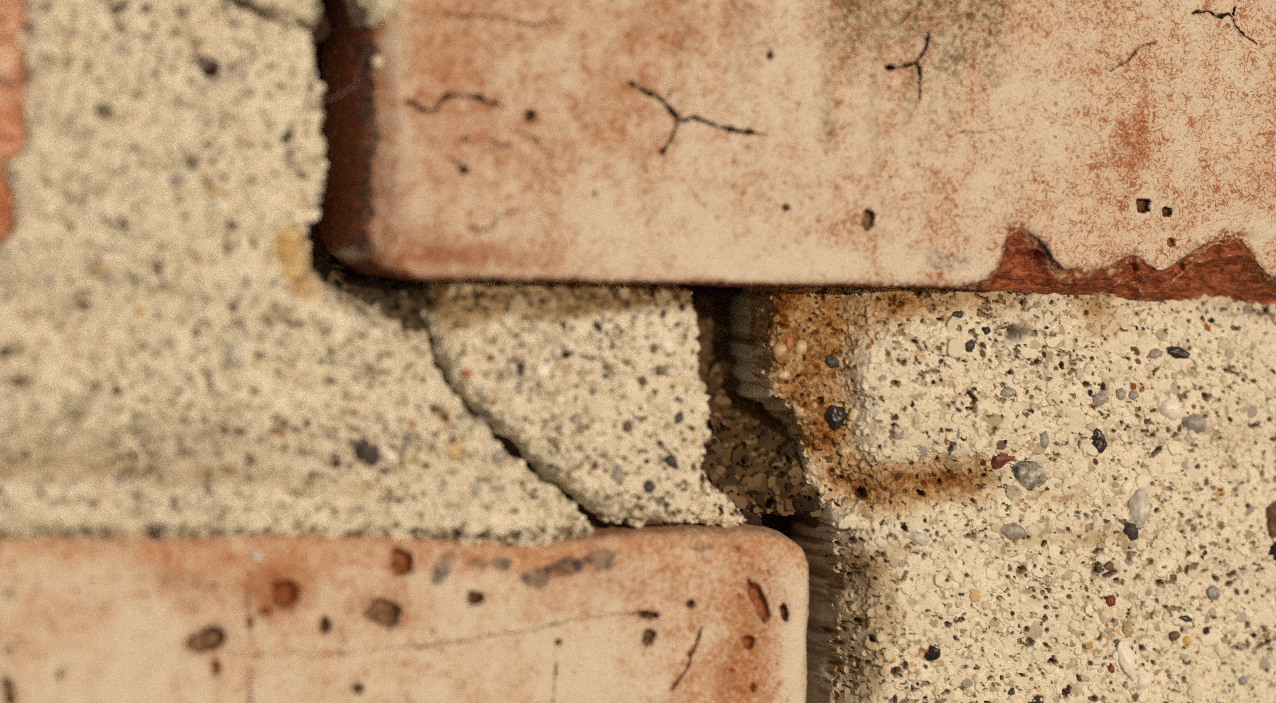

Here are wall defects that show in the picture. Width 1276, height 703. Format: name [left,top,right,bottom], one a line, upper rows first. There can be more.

crack [1191,7,1257,45]
crack [885,32,931,100]
crack [404,93,505,113]
crack [632,85,767,155]
spalling [962,227,1276,305]
crack [432,362,701,528]